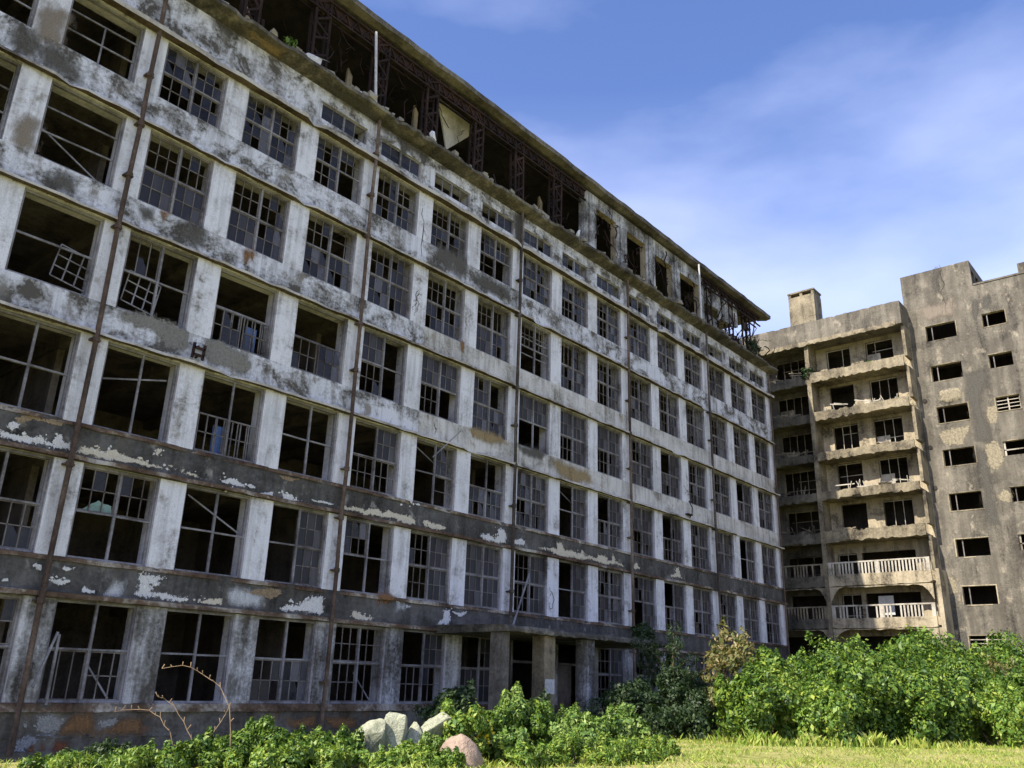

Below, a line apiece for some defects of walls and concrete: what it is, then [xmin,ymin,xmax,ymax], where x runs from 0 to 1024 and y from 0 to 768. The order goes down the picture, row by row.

peeling [0,415,201,479]
peeling [312,495,446,530]
peeling [539,542,640,570]
peeling [134,571,222,605]
peeling [241,587,325,616]